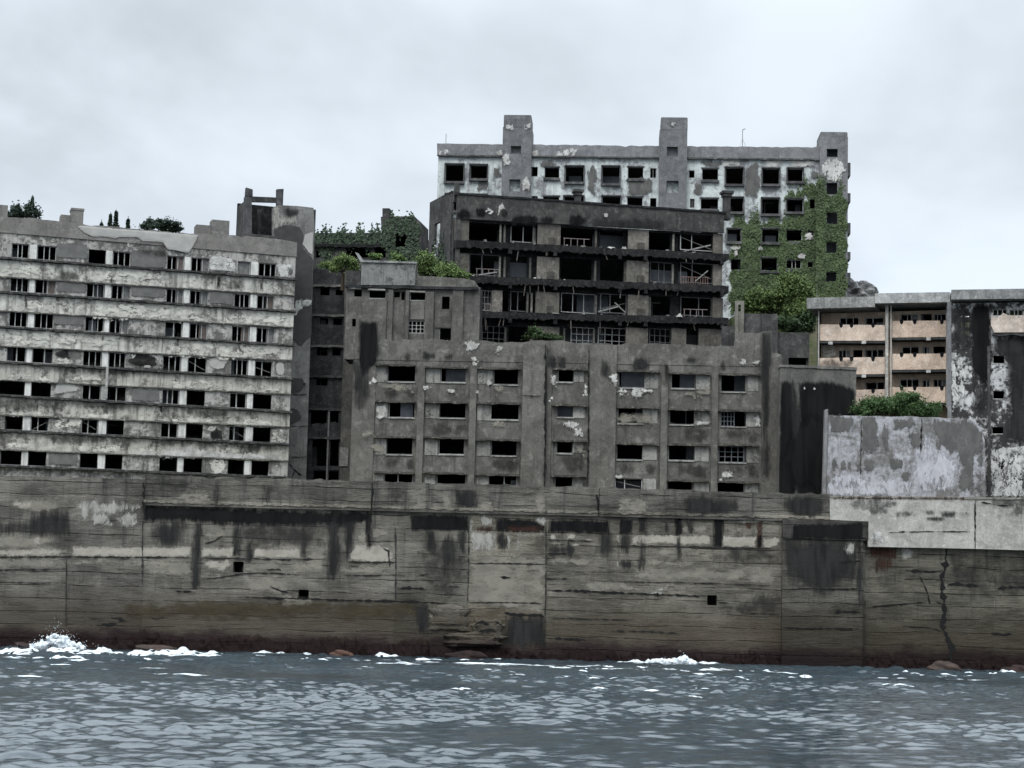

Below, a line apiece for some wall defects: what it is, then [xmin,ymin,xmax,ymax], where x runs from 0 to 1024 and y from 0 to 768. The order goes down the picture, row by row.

peeling [477,150,511,191]
peeling [587,166,597,196]
peeling [12,226,205,364]
peeling [144,340,305,393]
damp [353,321,378,406]
spalling [563,421,585,457]
spalling [609,374,653,398]
damp [727,332,957,605]
peeling [829,414,923,483]
peeling [933,353,1024,498]
damp [0,488,372,588]
crack [0,482,1024,661]